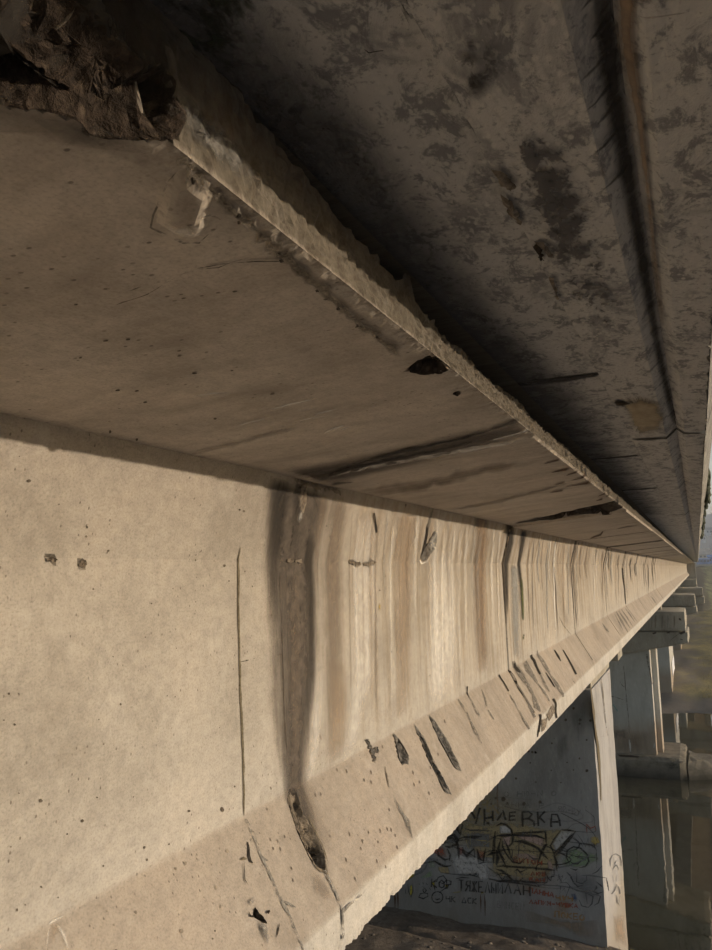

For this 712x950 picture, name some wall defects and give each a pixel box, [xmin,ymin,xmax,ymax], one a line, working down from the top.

water stain [0,0,40,47]
spalling [0,0,242,167]
water stain [150,0,655,512]
water stain [583,0,700,440]
spalling [406,355,450,375]
crack [238,547,304,950]
water stain [272,484,343,831]
spalling [394,734,420,786]
spalling [412,715,461,795]
spalling [499,650,564,732]
spalling [249,899,270,940]
spalling [288,790,361,939]